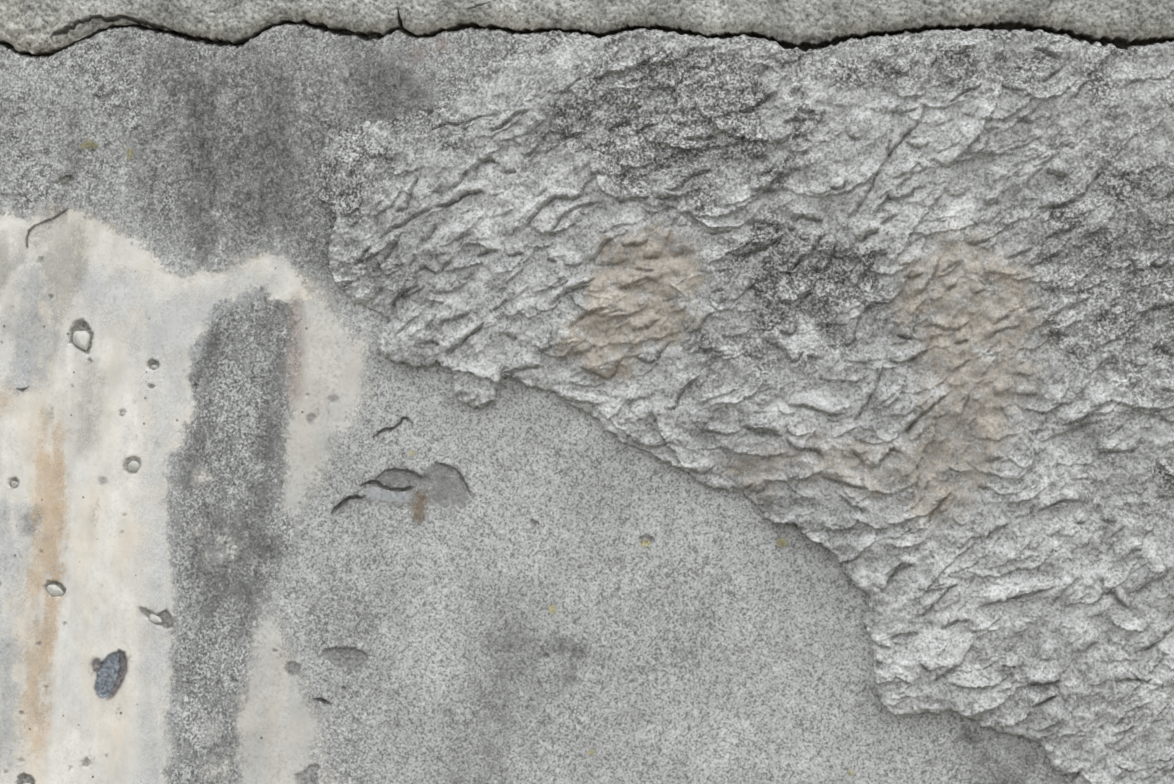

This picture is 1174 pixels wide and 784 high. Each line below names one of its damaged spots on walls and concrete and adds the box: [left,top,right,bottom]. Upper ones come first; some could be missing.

crack [0,2,1174,58]
peeling [0,195,373,784]
leakage [73,265,303,784]
spalling [331,462,471,520]
spalling [556,224,703,381]
spalling [894,230,1037,526]